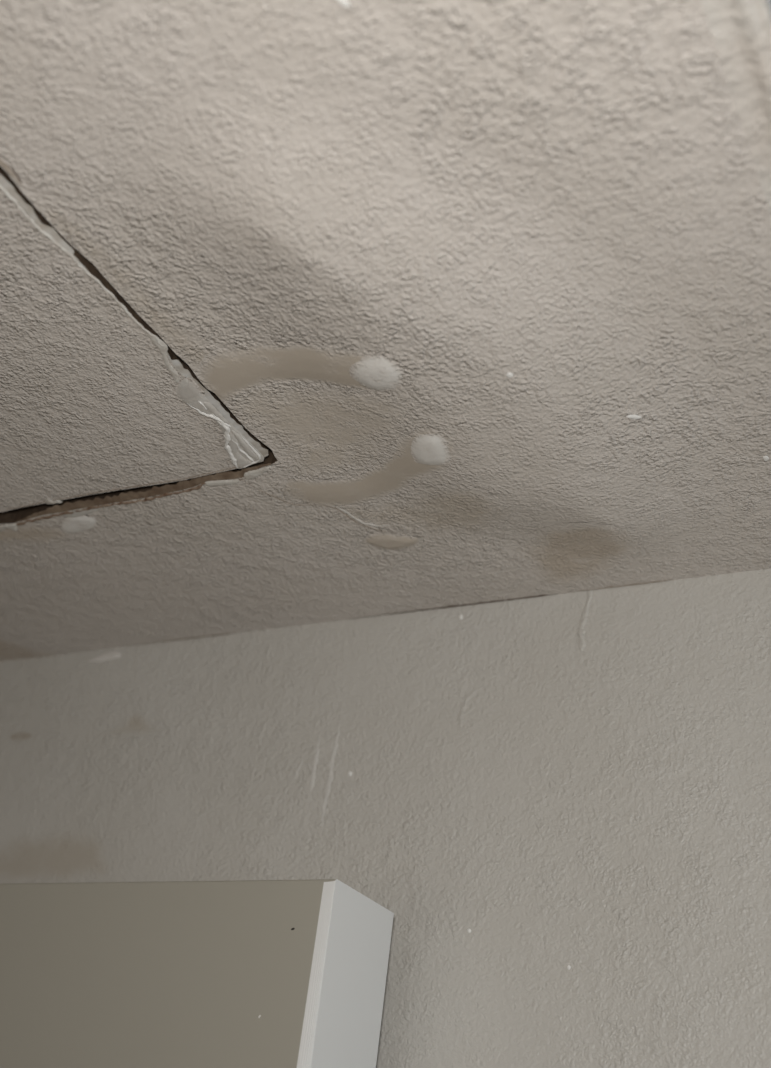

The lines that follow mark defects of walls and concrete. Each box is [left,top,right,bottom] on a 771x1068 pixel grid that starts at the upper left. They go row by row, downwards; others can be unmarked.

crack [0,158,394,533]
damp [226,383,417,480]